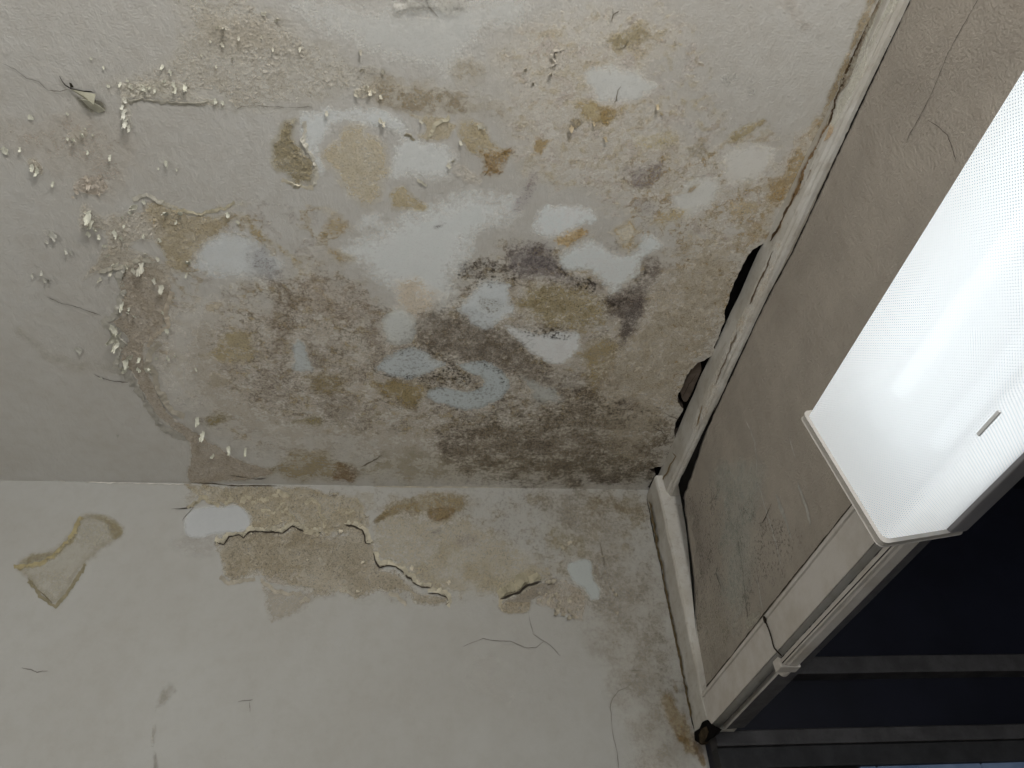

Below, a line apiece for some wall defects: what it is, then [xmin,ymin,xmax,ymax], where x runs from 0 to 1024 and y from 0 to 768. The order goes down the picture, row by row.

peeling [106,64,224,133]
crack [906,0,978,159]
peeling [83,193,270,483]
damp [372,139,804,482]
spalling [674,245,772,437]
peeling [14,516,87,609]
peeling [185,506,452,608]
peeling [496,572,557,612]
peeling [568,560,599,599]
crack [647,500,852,728]